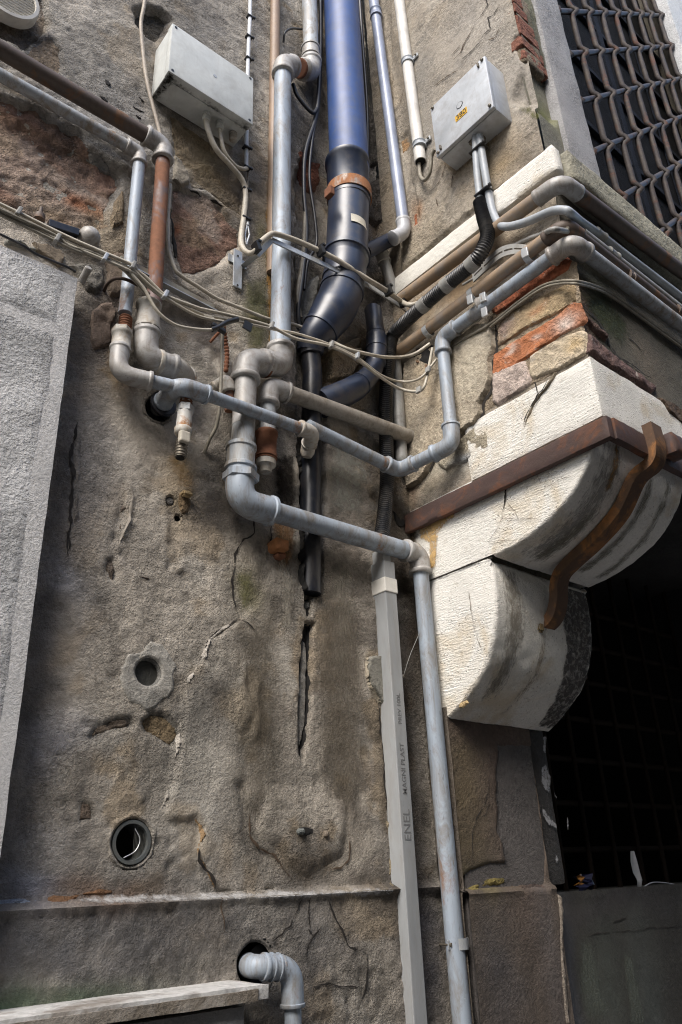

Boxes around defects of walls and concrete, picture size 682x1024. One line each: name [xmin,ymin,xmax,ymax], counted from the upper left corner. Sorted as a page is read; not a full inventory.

crack [523,372,557,427]
crack [66,422,81,556]
crack [198,521,272,661]
spalling [92,719,129,736]
spalling [142,715,182,757]
crack [297,599,311,756]
crack [195,819,225,931]
crack [271,898,368,1010]